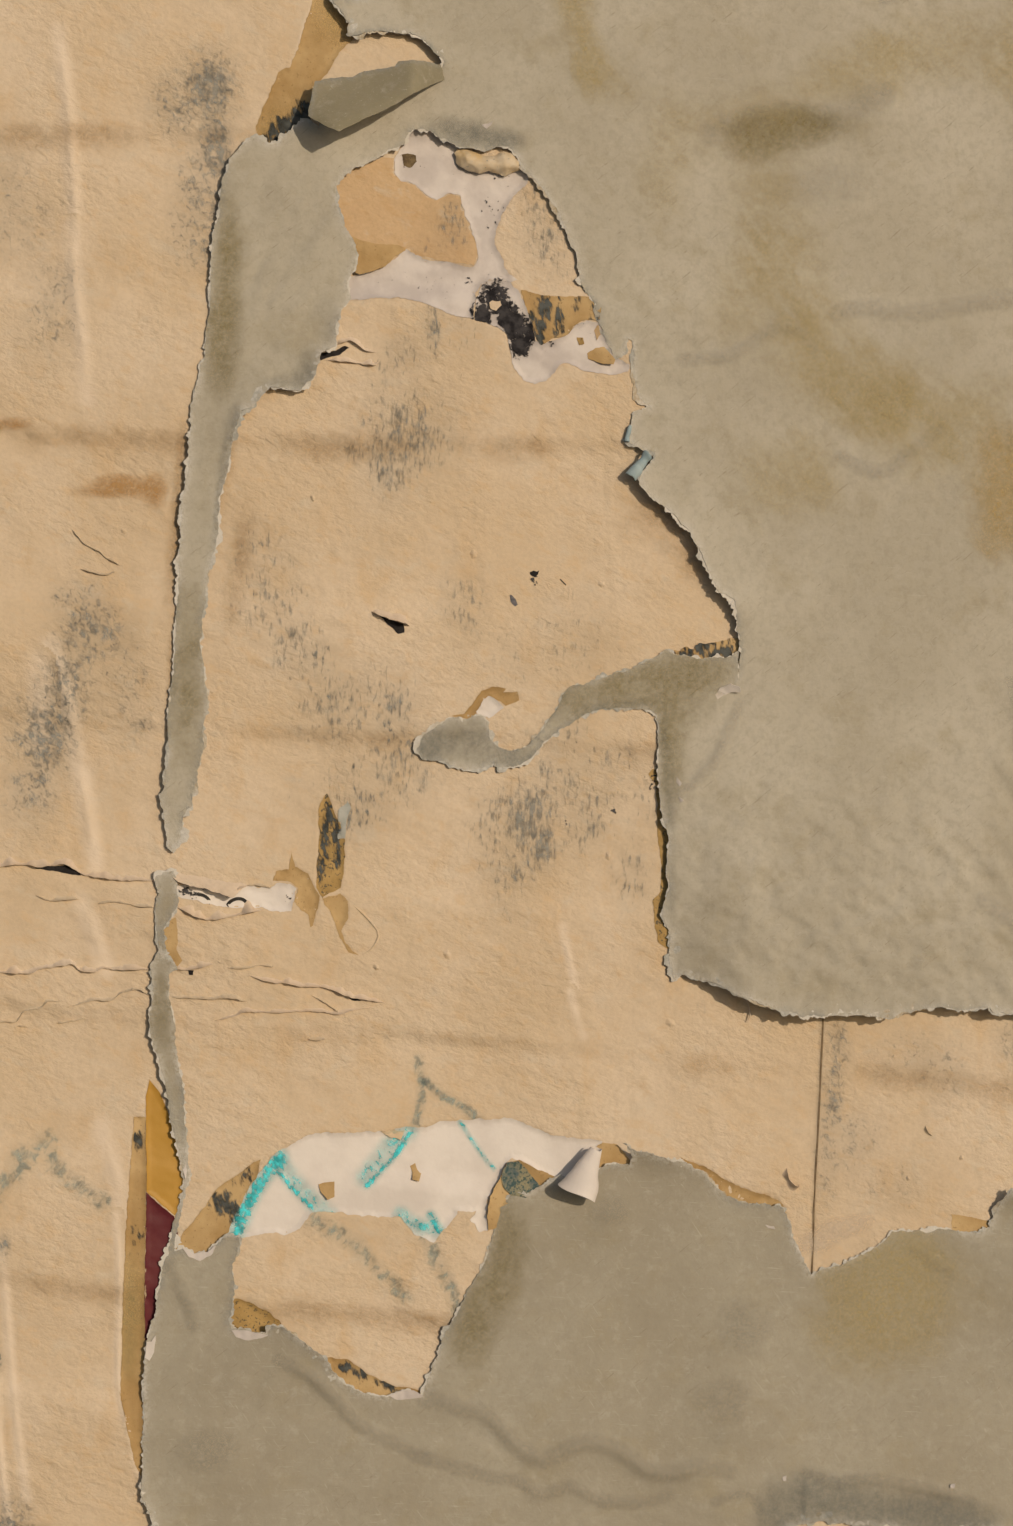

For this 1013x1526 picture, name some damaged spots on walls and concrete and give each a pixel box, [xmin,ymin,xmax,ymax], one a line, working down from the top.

peeling [256,0,354,143]
peeling [349,129,630,384]
peeling [176,1117,630,1253]
peeling [681,1158,786,1212]
peeling [120,1116,147,1477]
peeling [231,1299,281,1334]
peeling [327,1357,420,1396]